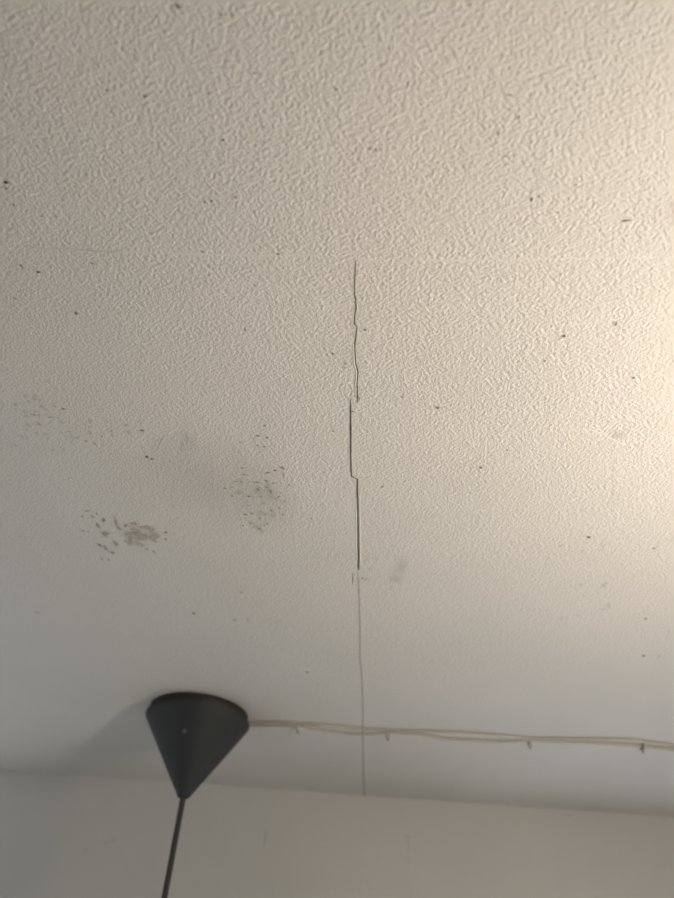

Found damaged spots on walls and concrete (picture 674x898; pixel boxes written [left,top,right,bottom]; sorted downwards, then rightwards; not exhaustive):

crack [350,262,365,796]